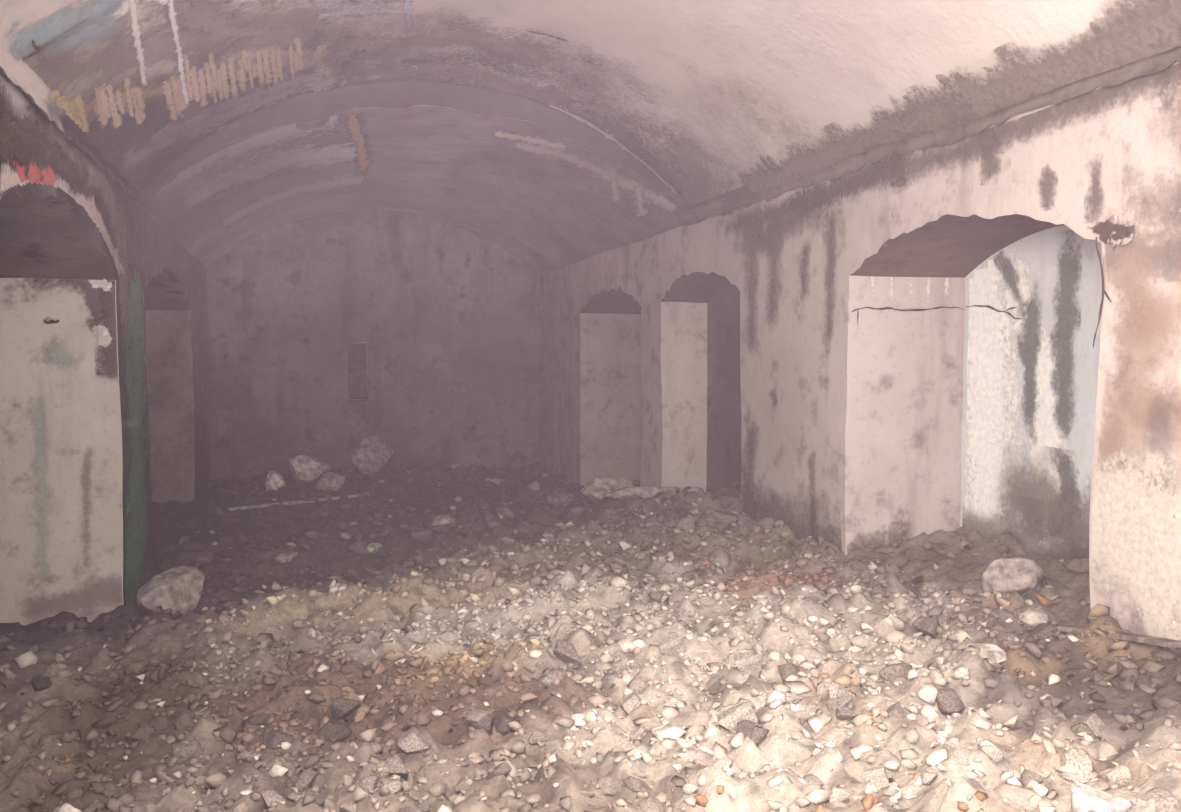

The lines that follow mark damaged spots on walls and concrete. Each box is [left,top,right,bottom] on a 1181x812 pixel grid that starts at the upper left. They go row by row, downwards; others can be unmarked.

damp [120,15,729,237]
crack [852,305,1021,324]
damp [727,63,1181,346]
damp [961,230,1090,561]
flaking render [1088,215,1135,250]